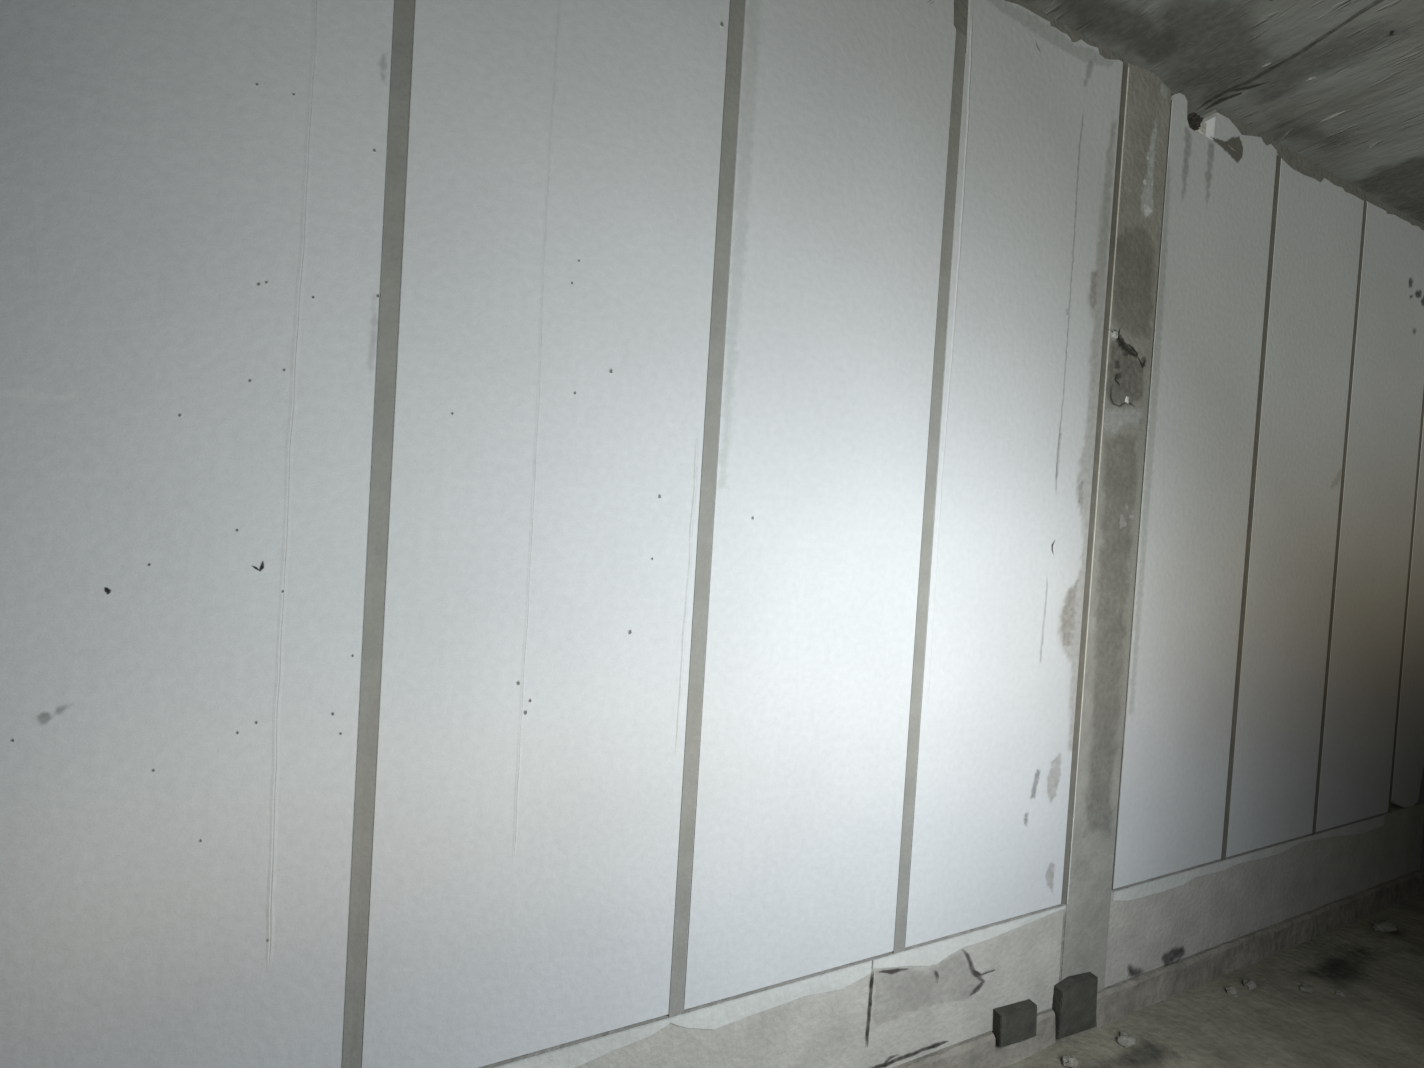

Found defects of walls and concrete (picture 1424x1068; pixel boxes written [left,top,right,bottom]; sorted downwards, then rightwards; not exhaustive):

damp [1141,121,1157,219]
crack [867,973,948,1068]